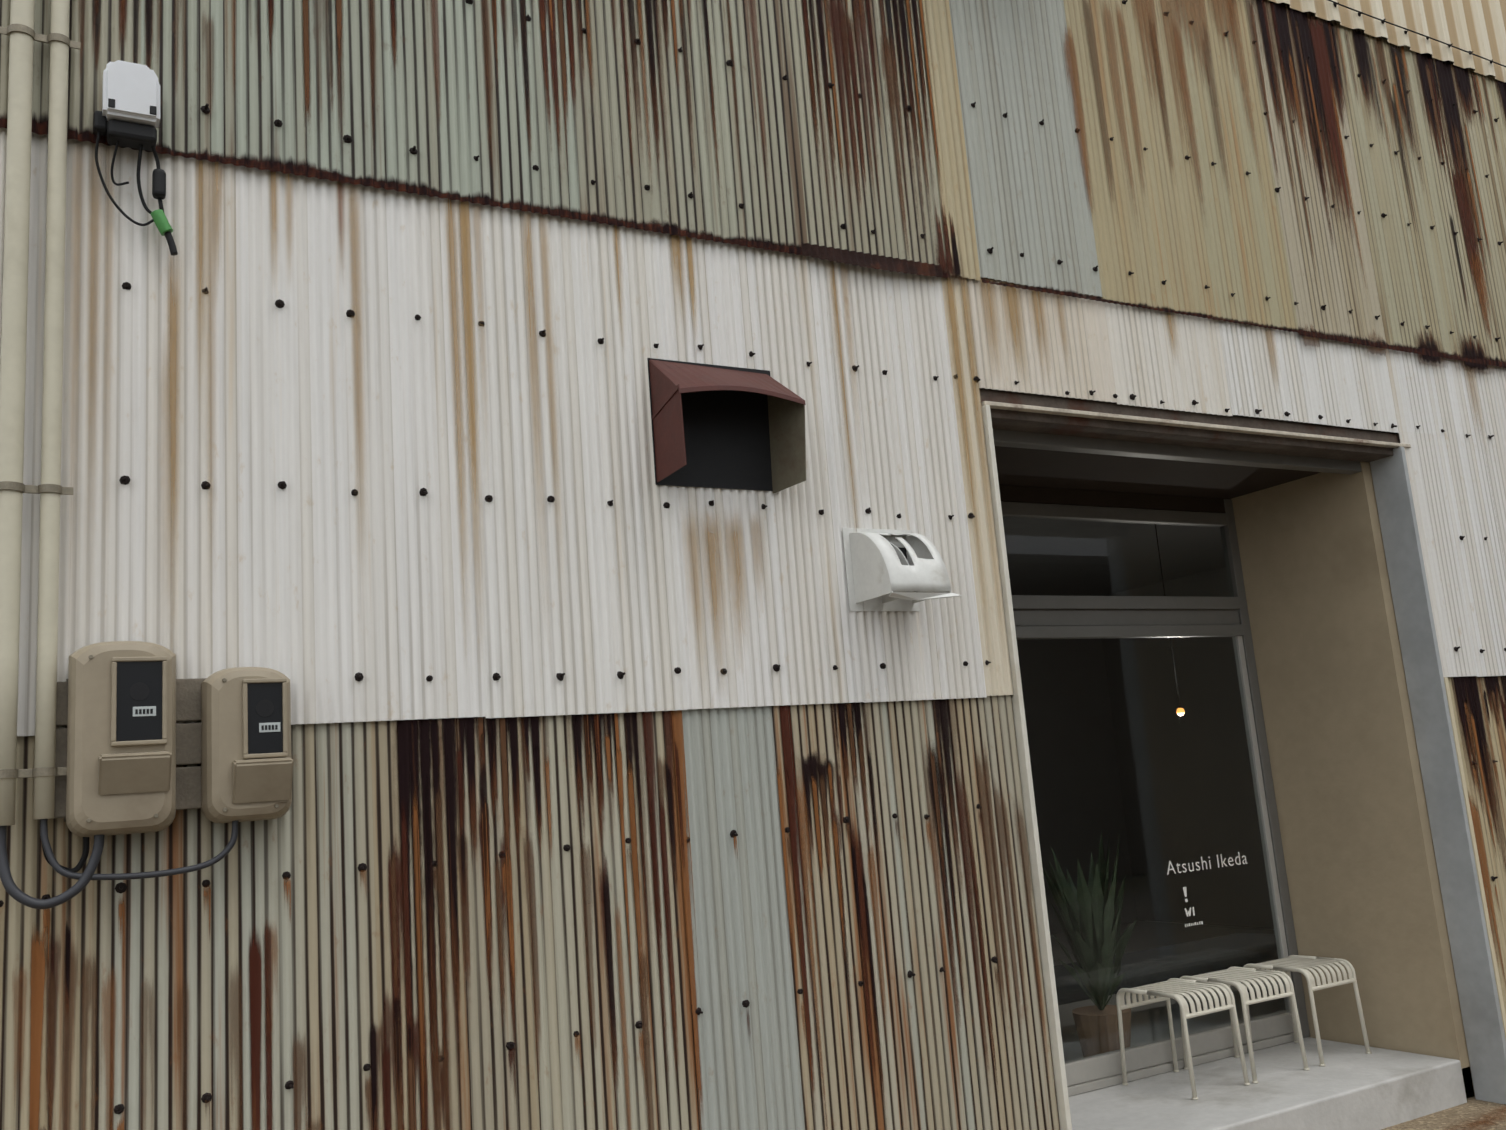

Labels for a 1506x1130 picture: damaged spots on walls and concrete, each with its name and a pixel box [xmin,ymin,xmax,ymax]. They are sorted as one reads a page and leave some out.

rust [32,114,48,135]
rust [93,0,101,65]
rust [119,0,152,69]
rust [67,125,804,256]
rust [492,0,591,165]
rust [620,0,719,178]
rust [802,0,960,279]
rust [982,0,1506,370]
rust [365,716,552,1130]
rust [777,702,884,1091]
rust [926,699,1024,1068]
rust [1452,676,1506,979]